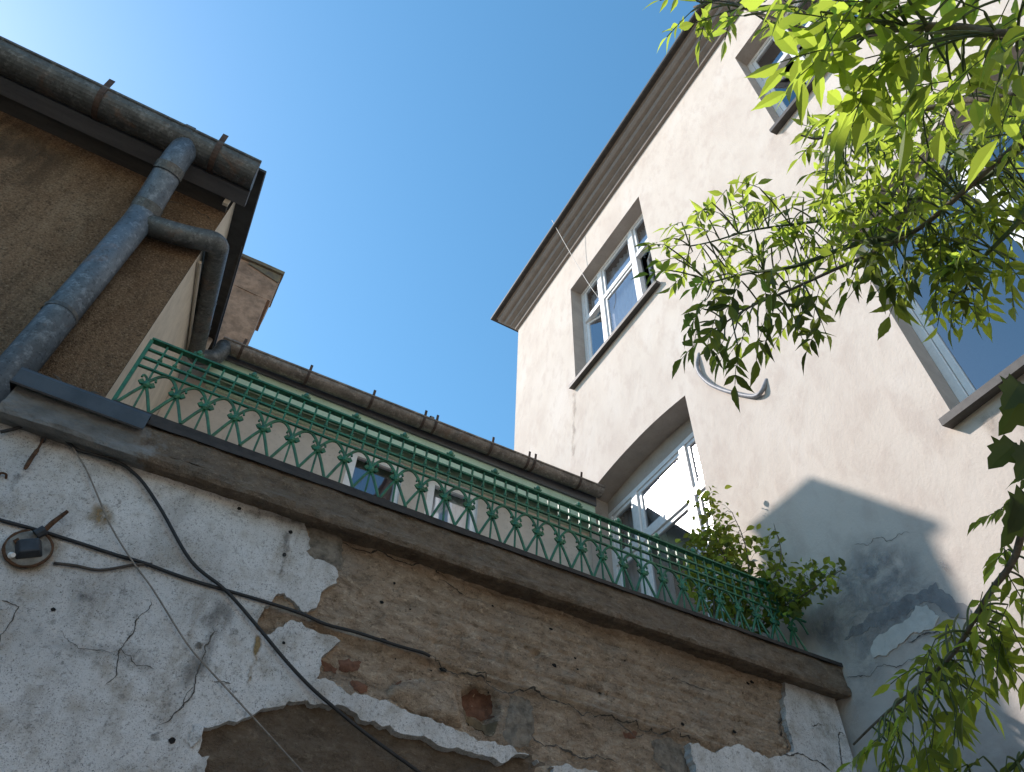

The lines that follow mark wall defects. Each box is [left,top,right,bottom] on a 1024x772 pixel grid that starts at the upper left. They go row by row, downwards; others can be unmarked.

rust [1,529,54,569]
crack [59,602,154,684]
crack [156,627,231,728]
flaking render [198,541,791,772]
peeling [845,582,971,658]